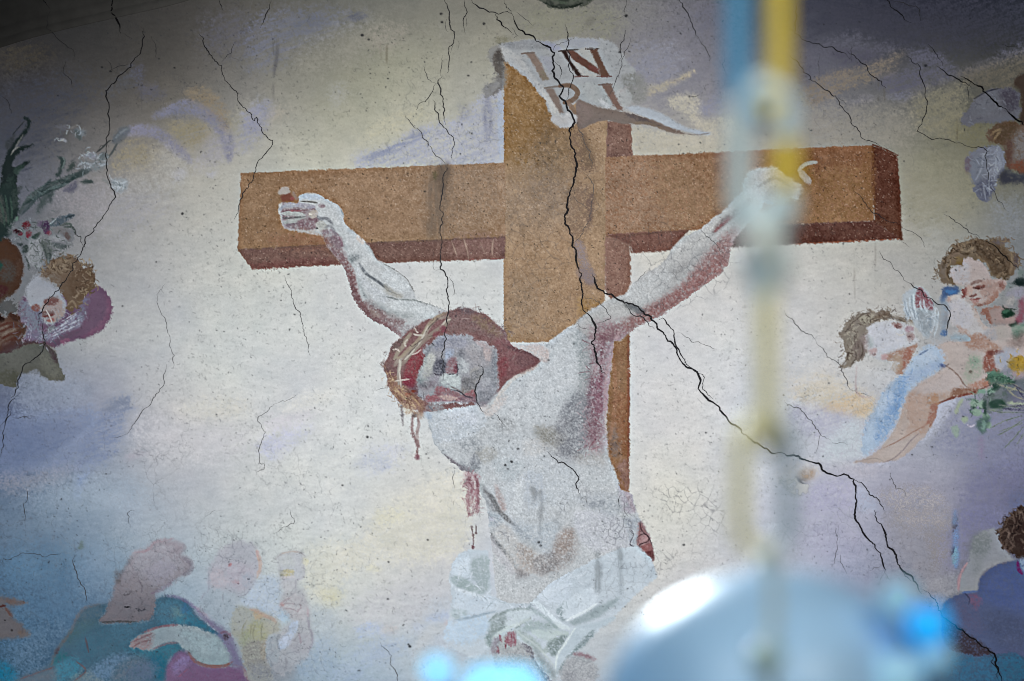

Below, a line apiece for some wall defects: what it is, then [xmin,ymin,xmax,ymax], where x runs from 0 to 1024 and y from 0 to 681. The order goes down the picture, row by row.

crack [200,35,273,219]
crack [907,46,1023,211]
crack [0,0,156,453]
crack [946,215,1019,270]
crack [115,292,175,438]
crack [408,0,1002,681]